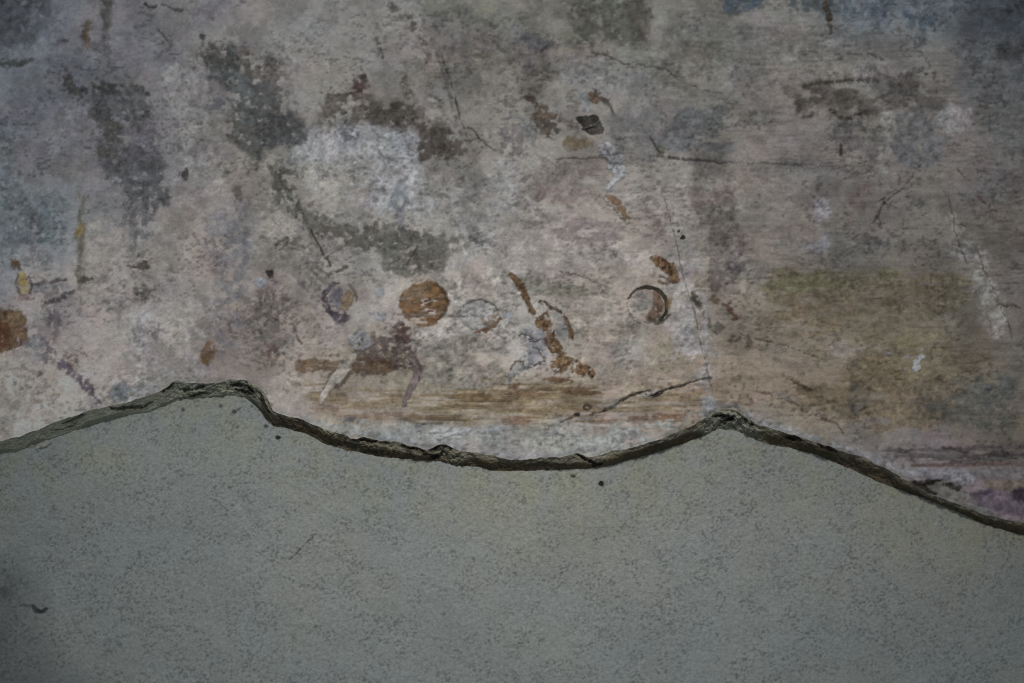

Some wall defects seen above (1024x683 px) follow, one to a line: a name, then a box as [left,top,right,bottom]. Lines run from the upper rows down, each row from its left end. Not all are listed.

crack [954,224,1021,335]
crack [590,378,711,415]
spalling [0,379,1024,535]